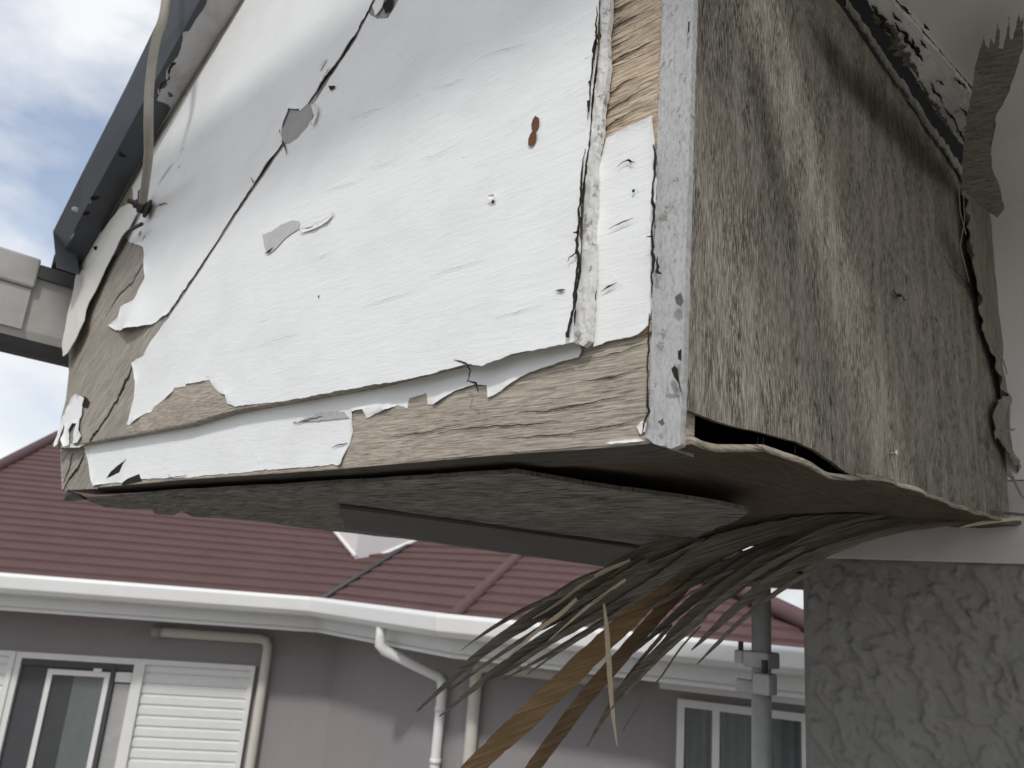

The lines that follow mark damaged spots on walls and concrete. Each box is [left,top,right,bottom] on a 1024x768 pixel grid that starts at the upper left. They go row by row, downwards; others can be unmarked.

peeling [279,94,318,154]
crack [308,0,374,103]
corrosion [528,116,539,146]
crack [587,6,598,119]
peeling [872,5,1024,218]
crack [167,144,282,316]
peeling [262,212,335,254]
crack [565,149,617,338]
peeling [53,204,236,491]
crack [456,360,478,391]
peeling [293,333,665,467]
peeling [671,349,682,394]